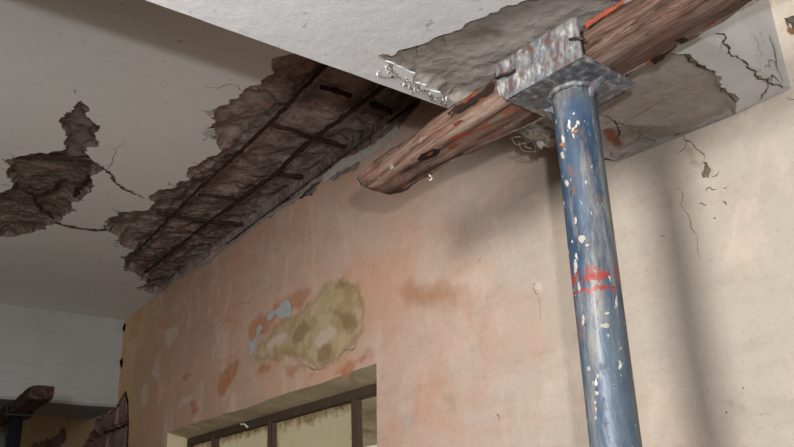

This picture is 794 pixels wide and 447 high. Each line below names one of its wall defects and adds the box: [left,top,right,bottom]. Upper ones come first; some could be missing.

crack [715,33,794,101]
spalling [598,52,739,178]
spalling [0,100,105,237]
crack [100,140,143,198]
spalling [102,0,624,301]
crack [54,221,109,232]
crack [678,188,700,257]
peeling [249,279,364,371]
peeling [32,428,67,447]
flaking render [83,391,129,447]